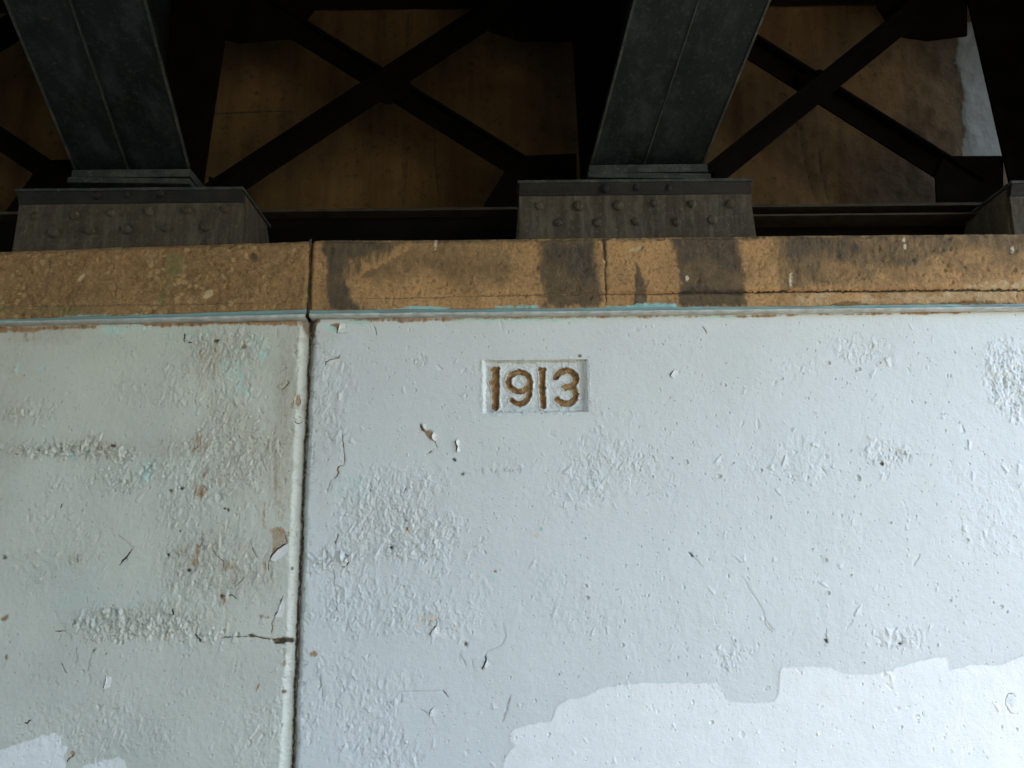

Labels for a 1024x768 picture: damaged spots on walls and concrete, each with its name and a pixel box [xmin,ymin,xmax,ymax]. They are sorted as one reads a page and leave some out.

leakage [297,238,602,342]
leakage [666,237,748,299]
peeling [981,337,1024,416]
crack [223,597,285,640]